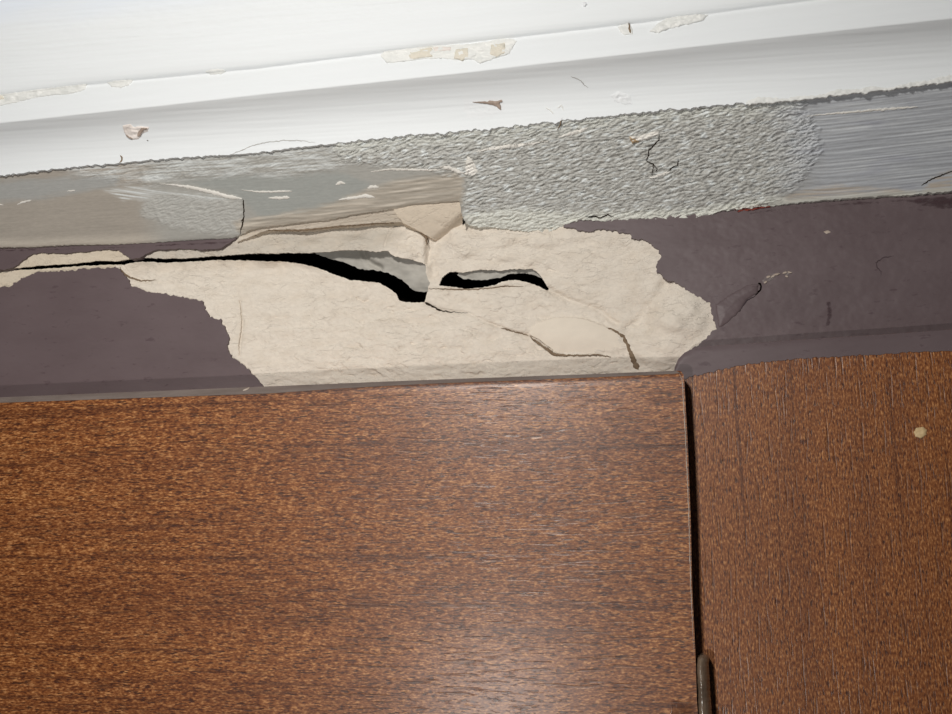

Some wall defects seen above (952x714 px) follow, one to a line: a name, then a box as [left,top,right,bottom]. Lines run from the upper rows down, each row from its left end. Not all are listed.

peeling [381,38,517,64]
peeling [629,131,660,144]
peeling [465,156,478,176]
crack [502,327,639,370]
spalling [0,202,716,644]